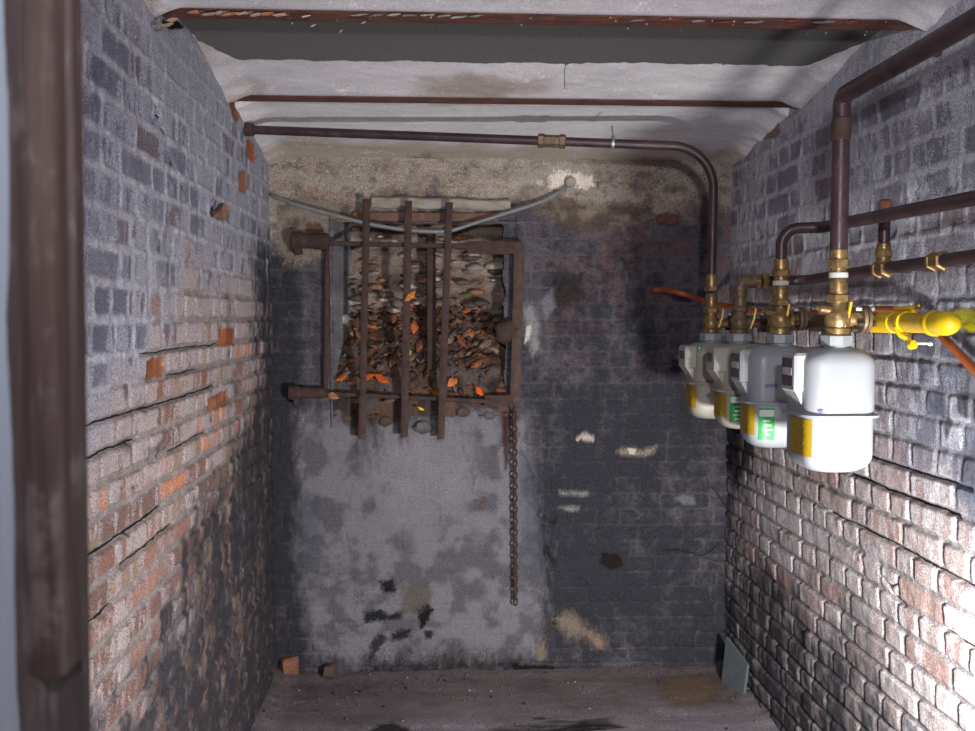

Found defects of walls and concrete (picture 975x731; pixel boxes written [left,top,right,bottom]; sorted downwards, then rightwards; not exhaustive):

crack [87,343,216,426]
crack [87,438,133,459]
crack [89,505,170,566]
water stain [545,613,603,648]
water stain [371,723,409,731]
water stain [515,719,623,731]